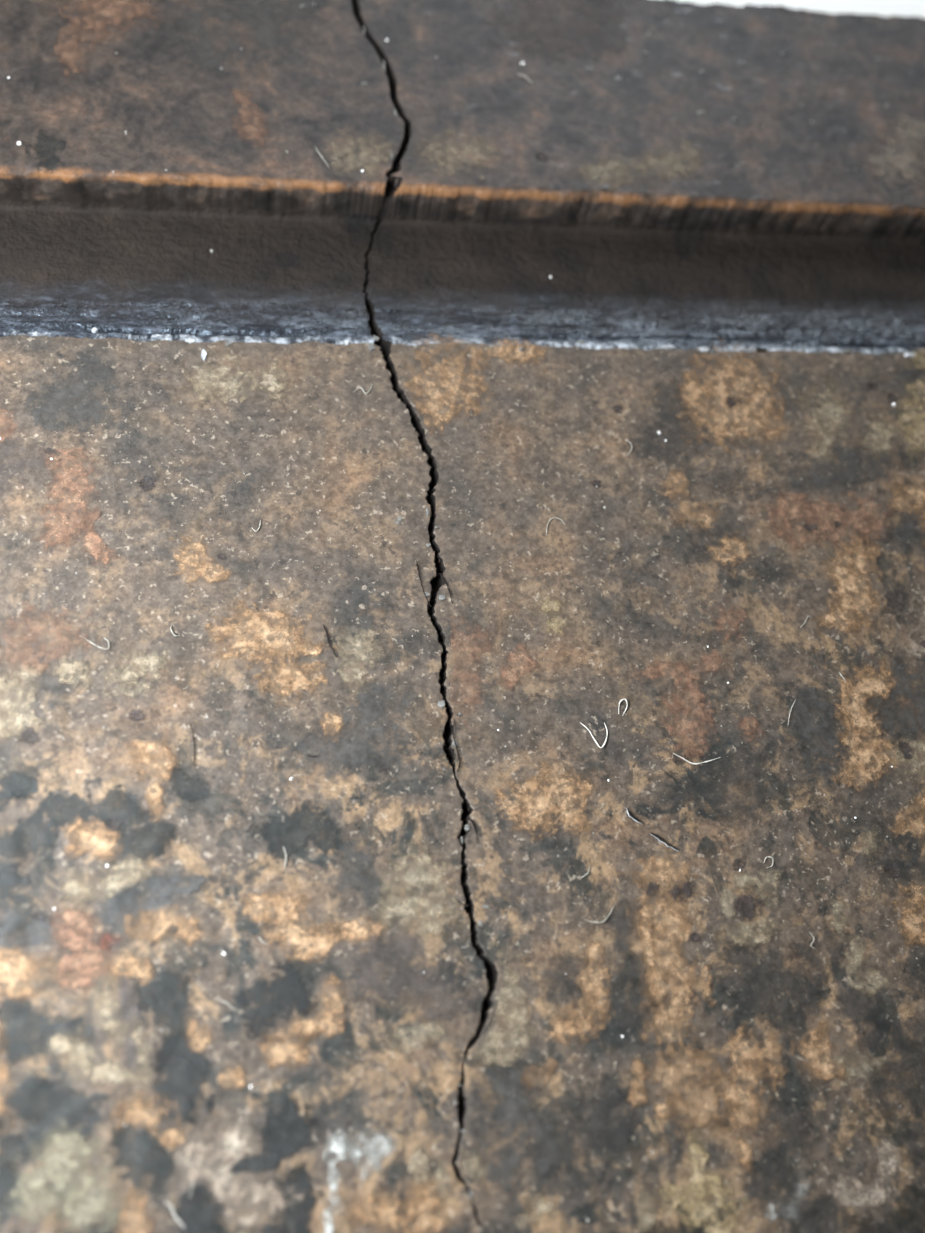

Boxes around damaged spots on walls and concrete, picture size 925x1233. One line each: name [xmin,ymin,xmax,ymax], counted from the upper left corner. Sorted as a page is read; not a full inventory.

corrosion [676,347,785,452]
corrosion [0,650,167,738]
corrosion [205,600,385,695]
crack [351,0,498,1227]
corrosion [495,763,592,841]
corrosion [765,482,925,645]
corrosion [832,661,925,838]
corrosion [241,845,460,960]
corrosion [0,816,303,1233]
corrosion [258,975,347,1068]
corrosion [471,942,611,1090]
corrosion [626,854,900,1233]